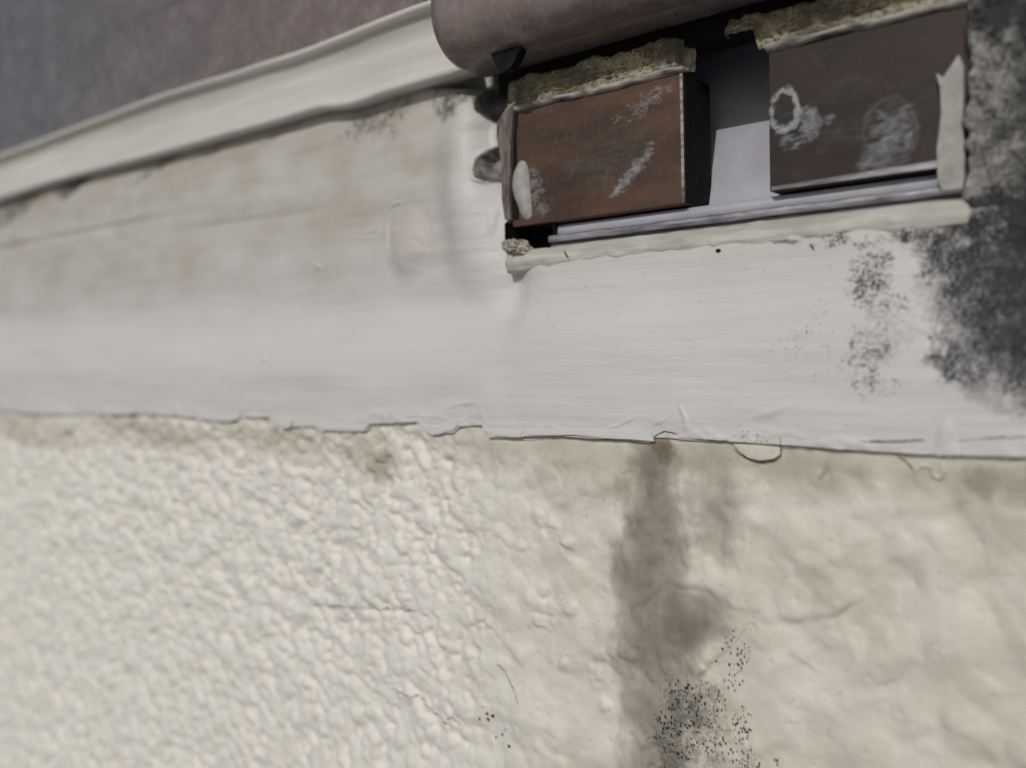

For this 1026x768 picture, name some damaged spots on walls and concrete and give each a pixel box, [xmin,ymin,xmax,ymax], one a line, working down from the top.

damp [894,0,1026,412]
damp [828,231,906,312]
peeling [491,428,655,441]
peeling [734,444,780,460]
damp [622,444,760,768]